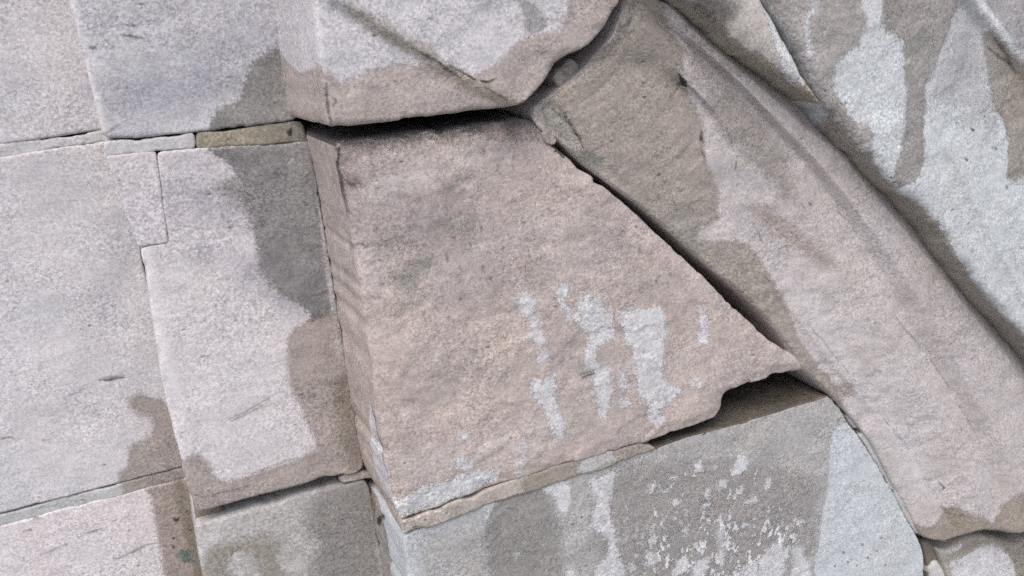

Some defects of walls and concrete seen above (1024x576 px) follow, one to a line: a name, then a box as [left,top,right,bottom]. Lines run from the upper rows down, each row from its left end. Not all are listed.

water stain [119,141,501,576]
water stain [207,0,1024,576]